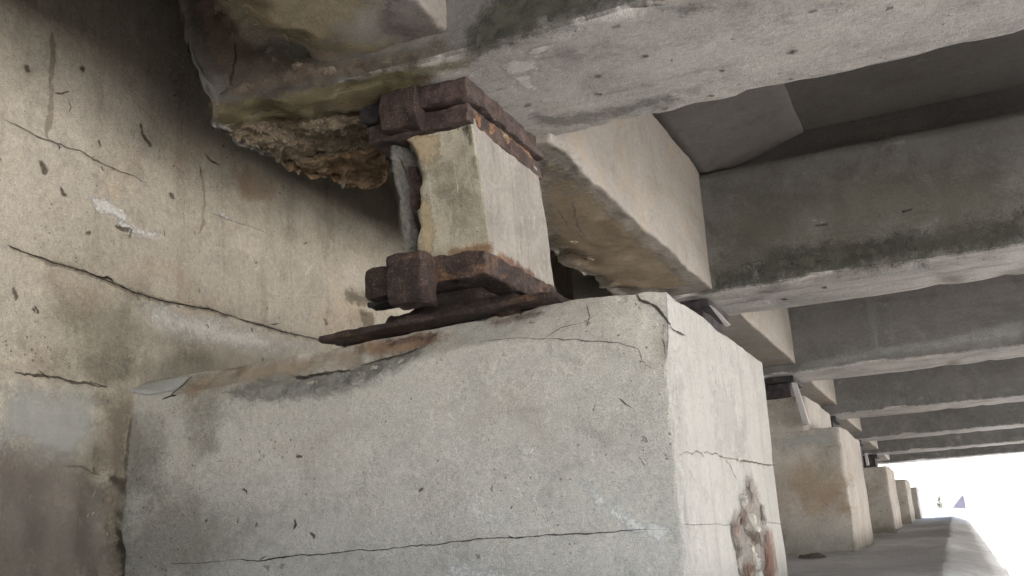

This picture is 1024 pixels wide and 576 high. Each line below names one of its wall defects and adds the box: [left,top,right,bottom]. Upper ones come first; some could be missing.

crack [4,119,144,182]
rust [463,115,530,158]
crack [10,246,318,340]
crack [480,294,686,371]
crack [15,371,107,388]
damp [0,387,115,576]
crack [679,451,774,478]
crack [170,524,726,564]
spalling [733,477,778,576]